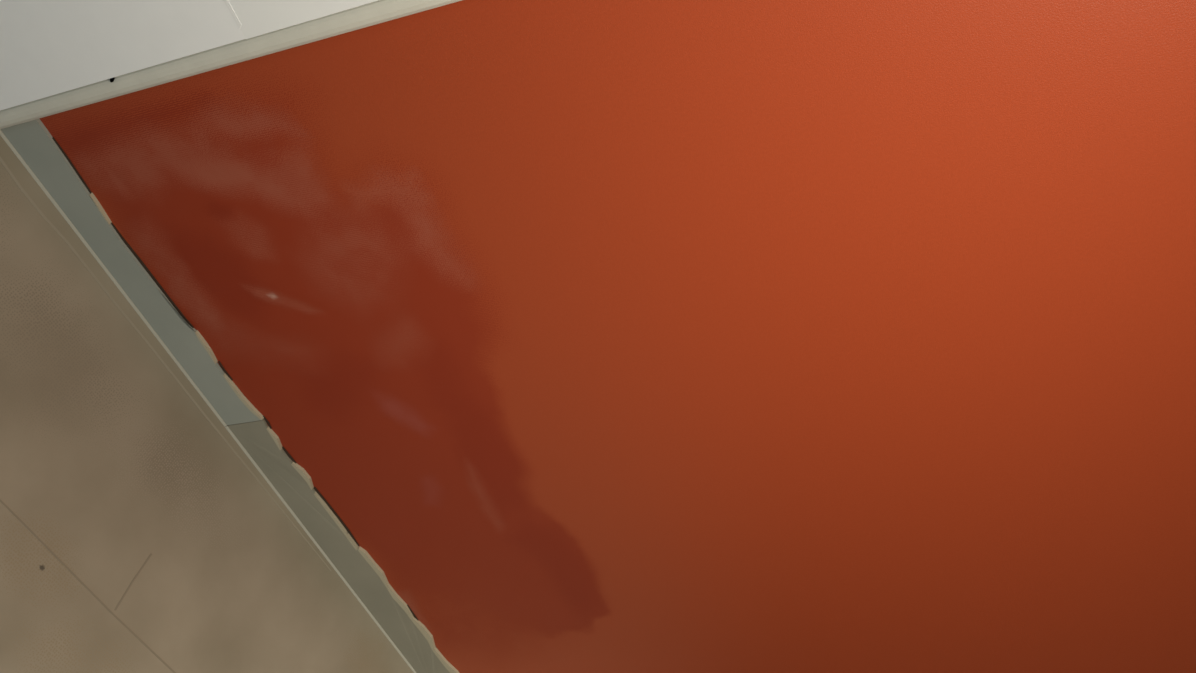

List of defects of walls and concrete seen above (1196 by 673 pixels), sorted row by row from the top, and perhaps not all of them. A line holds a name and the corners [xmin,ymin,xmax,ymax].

leakage [228,0,378,39]
leakage [39,58,613,667]